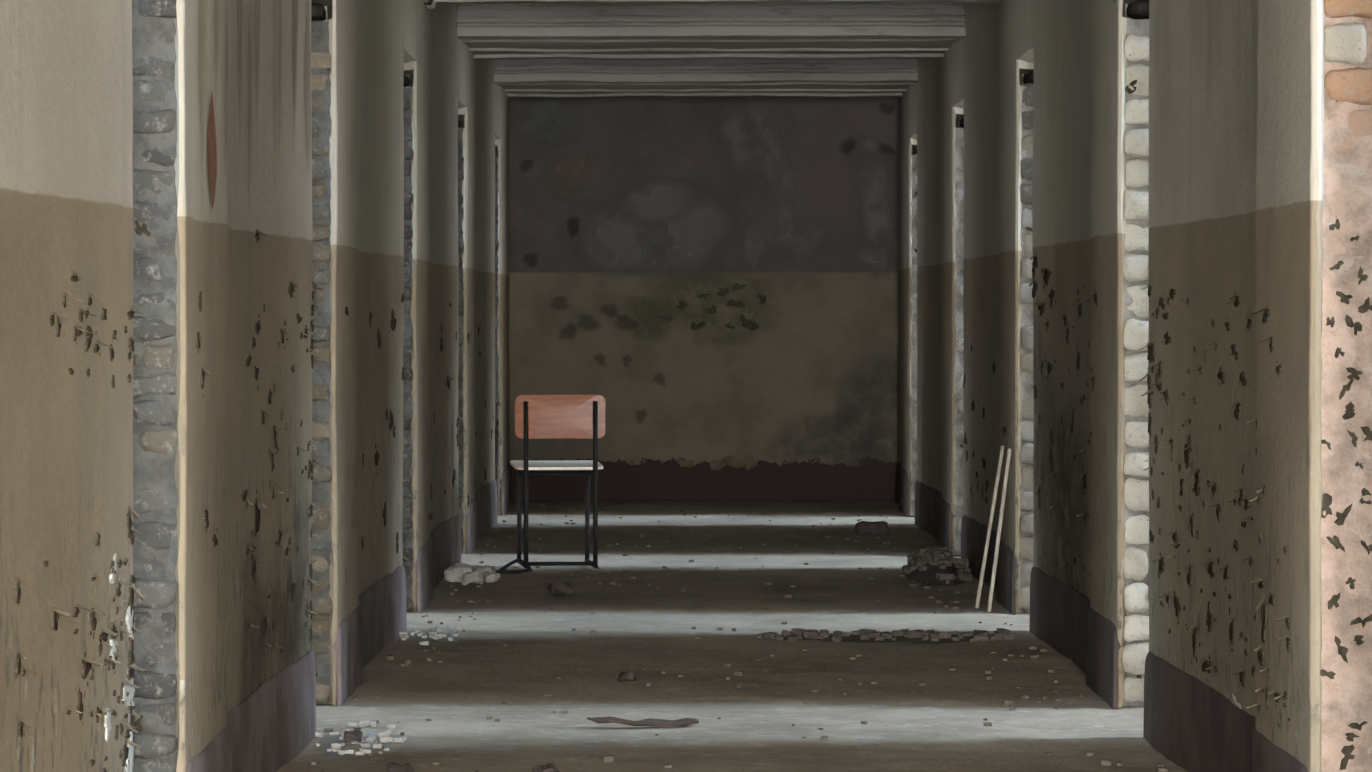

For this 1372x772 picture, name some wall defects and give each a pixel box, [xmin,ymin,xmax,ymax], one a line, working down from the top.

peeling [14,576,34,604]
peeling [15,648,38,677]
flaking render [49,0,178,772]
peeling [197,332,211,389]
peeling [204,510,218,547]
rust [208,94,217,209]
flaking render [241,3,349,704]
flaking render [359,75,413,612]
flaking render [429,119,499,553]
flaking render [1000,73,1098,613]
flaking render [1113,0,1291,728]